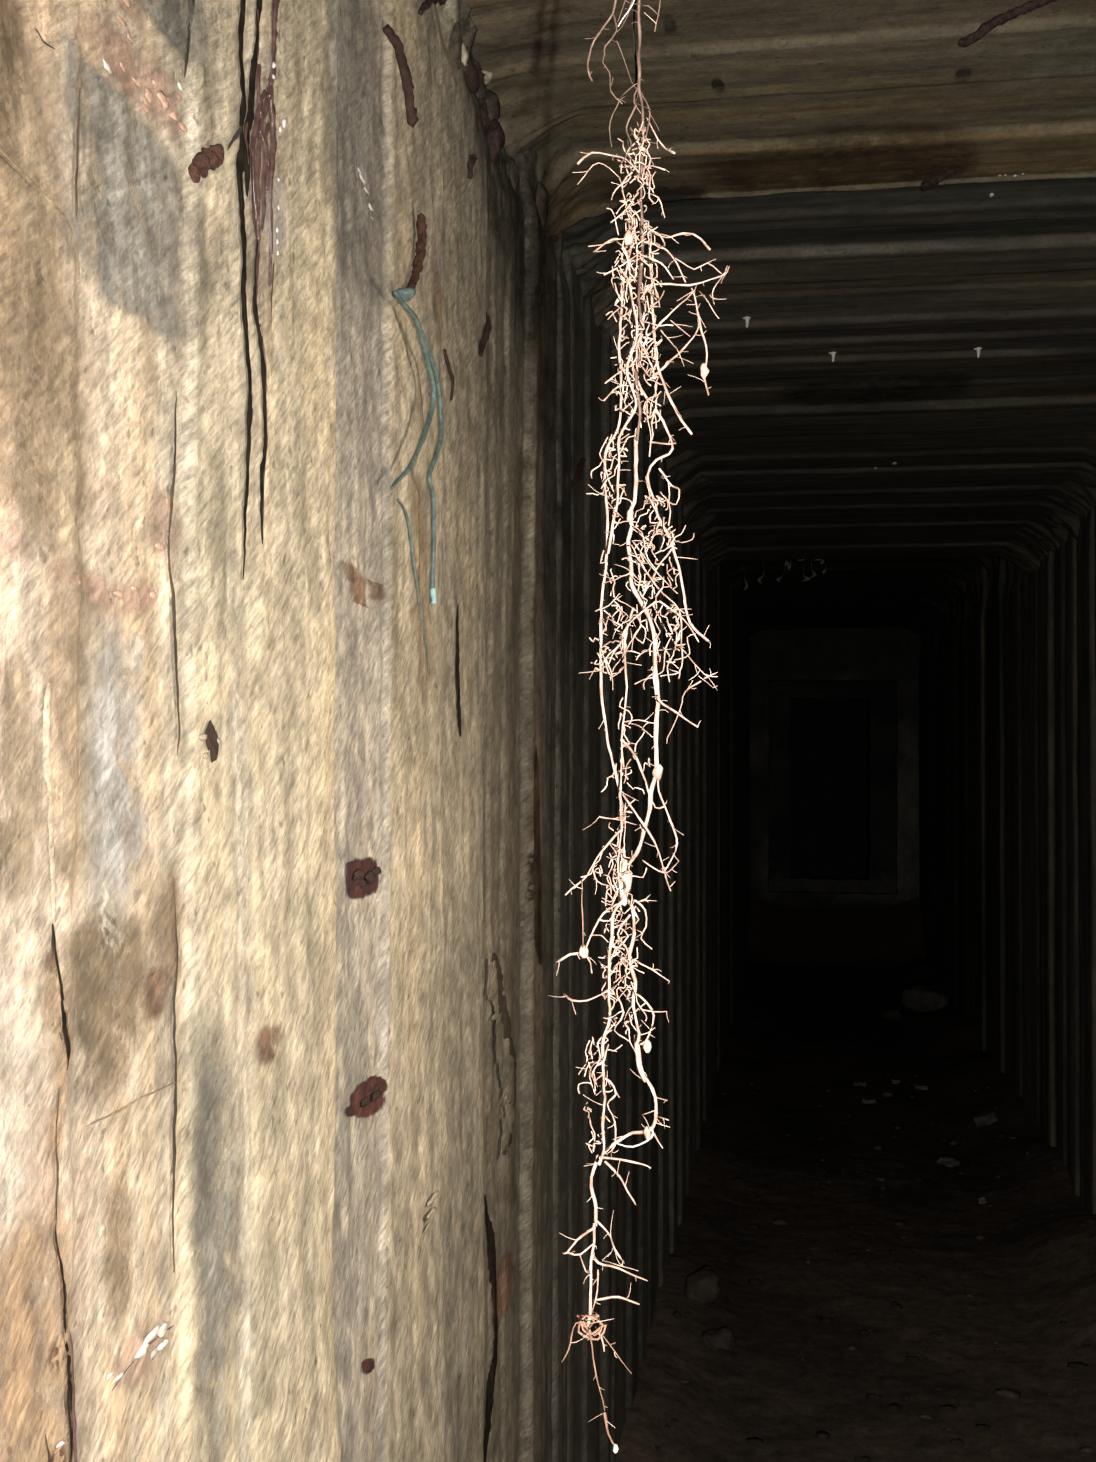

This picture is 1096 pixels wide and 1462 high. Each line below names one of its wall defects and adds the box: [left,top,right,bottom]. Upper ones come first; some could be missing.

crack [184,0,195,77]
corrosion [418,0,436,15]
corrosion [188,147,221,183]
crack [227,0,275,580]
crack [167,392,180,756]
corrosion [347,565,383,607]
crack [454,606,462,737]
corrosion [347,857,381,899]
corrosion [346,1076,388,1118]
crack [45,897,178,1462]
corrosion [363,1358,375,1373]
crack [483,1194,513,1462]